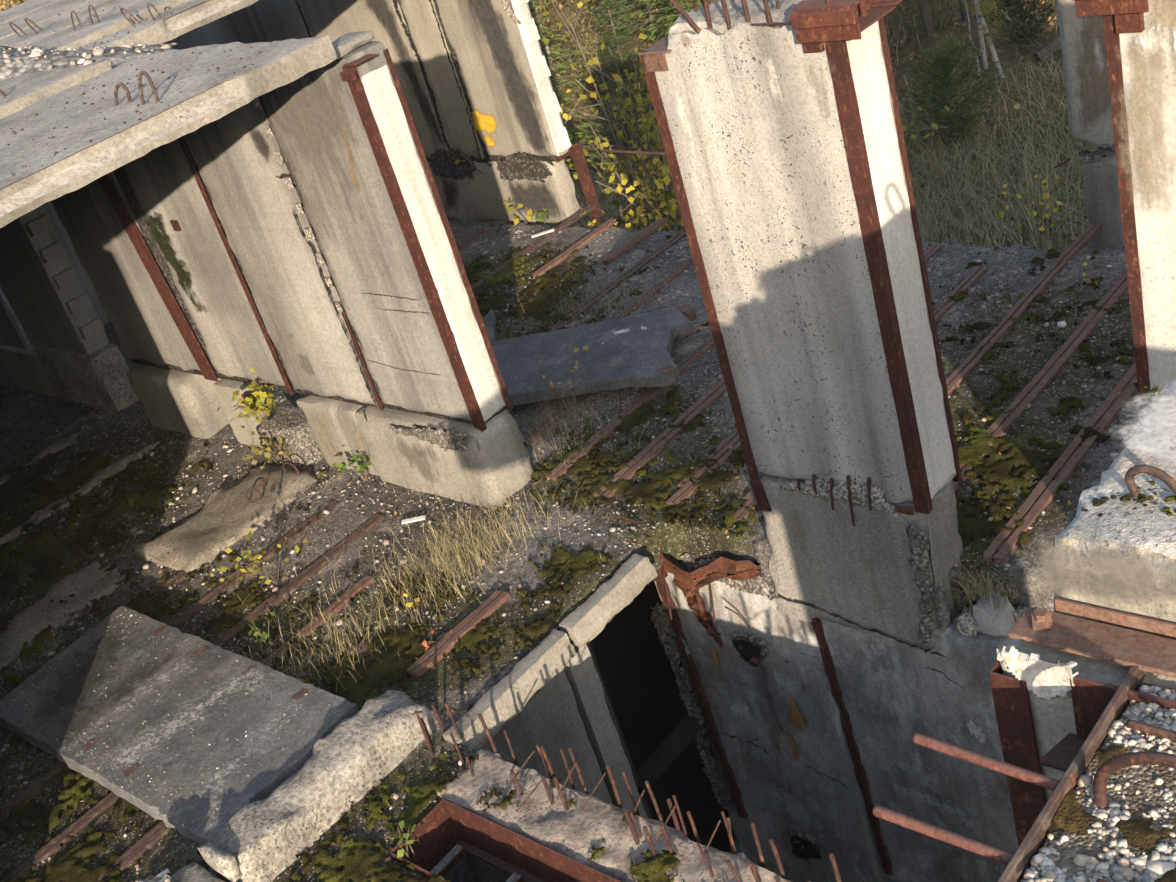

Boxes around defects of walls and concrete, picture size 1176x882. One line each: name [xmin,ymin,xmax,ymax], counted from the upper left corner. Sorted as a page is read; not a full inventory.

damp [1151,0,1176,37]
damp [367,0,443,143]
damp [468,0,548,154]
damp [1126,41,1164,207]
spalling [779,474,901,526]
spalling [650,603,735,811]
corrosion [648,551,761,819]
spalling [729,631,767,667]
crack [770,595,965,689]
spalling [997,646,1078,700]
spalling [787,828,826,861]